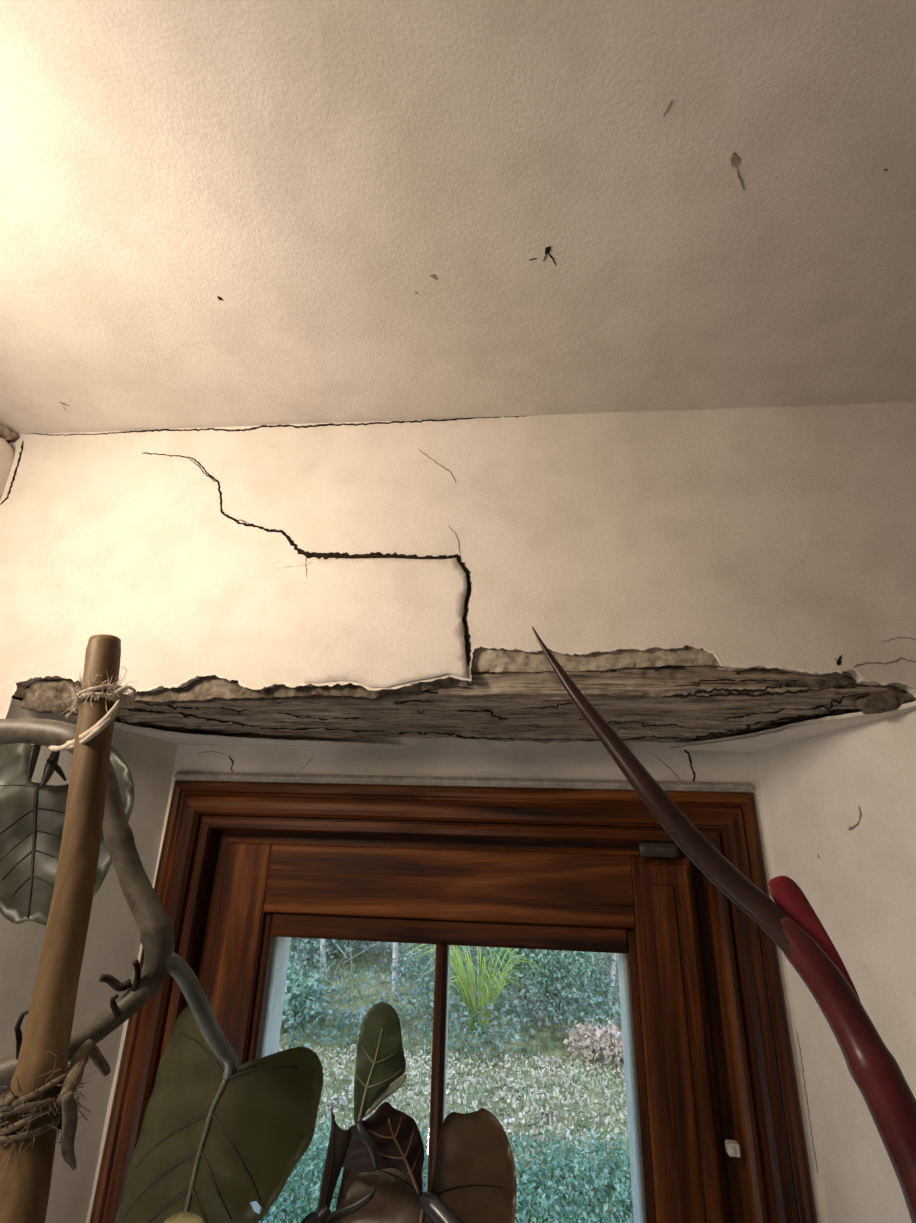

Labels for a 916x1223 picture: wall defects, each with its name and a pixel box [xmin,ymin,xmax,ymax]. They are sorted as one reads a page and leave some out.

flaking render [0,422,18,499]
crack [0,416,526,666]
flaking render [11,675,82,716]
flaking render [114,644,916,744]